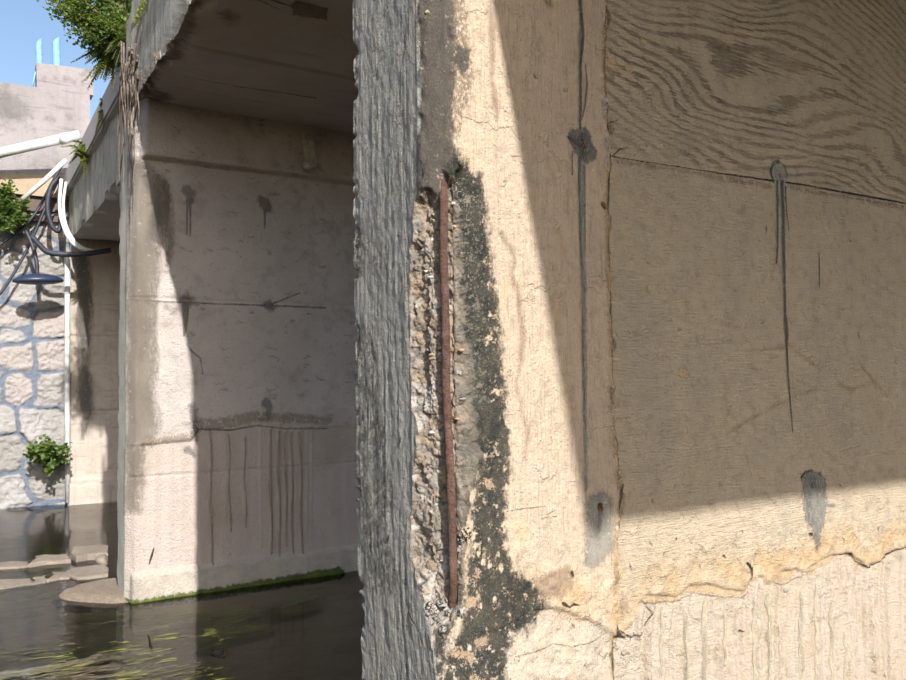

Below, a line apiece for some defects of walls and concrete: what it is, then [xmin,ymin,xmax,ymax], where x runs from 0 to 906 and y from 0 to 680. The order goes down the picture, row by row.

water stain [124,159,174,512]
water stain [176,292,199,336]
water stain [182,185,195,236]
water stain [189,404,198,441]
spalling [409,168,492,636]
water stain [416,0,546,680]
water stain [567,0,614,568]
crack [516,0,906,679]
water stain [766,159,793,431]
water stain [801,470,835,551]